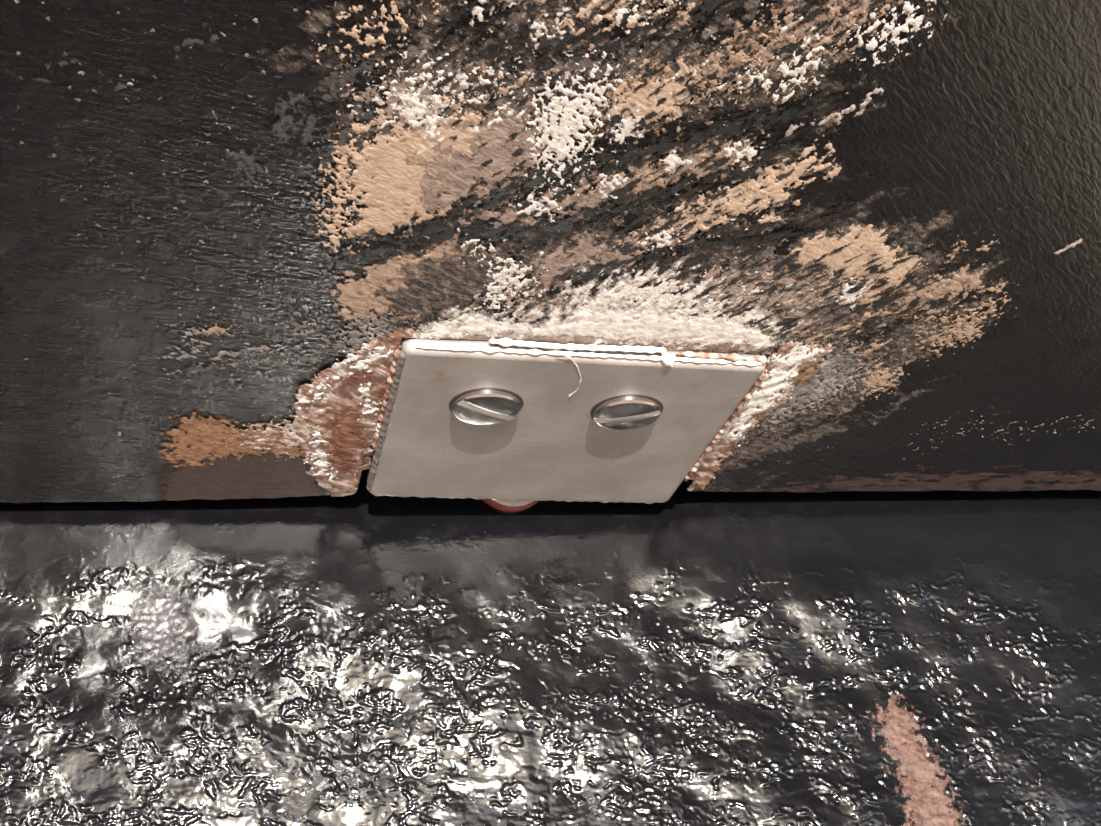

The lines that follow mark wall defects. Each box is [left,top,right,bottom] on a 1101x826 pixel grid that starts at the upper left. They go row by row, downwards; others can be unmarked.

leakage [273,54,380,170]
peeling [156,0,1019,492]
leakage [319,0,965,370]
corrosion [152,369,379,501]
corrosion [743,464,1101,493]
peeling [902,407,1095,460]
corrosion [866,693,965,826]